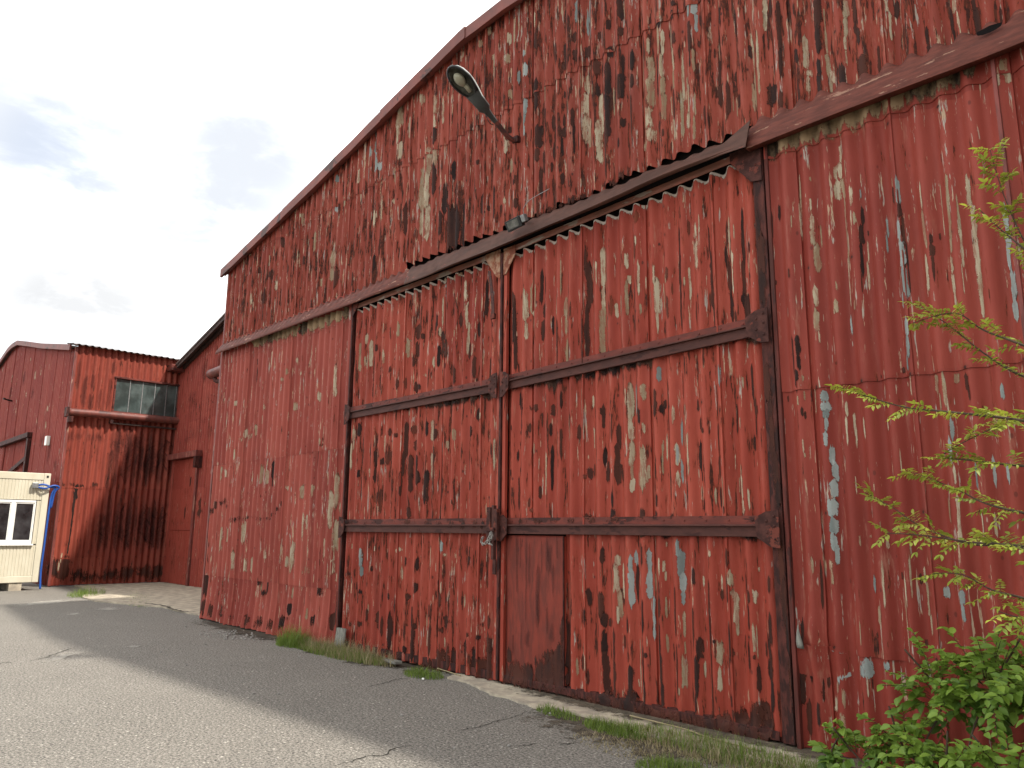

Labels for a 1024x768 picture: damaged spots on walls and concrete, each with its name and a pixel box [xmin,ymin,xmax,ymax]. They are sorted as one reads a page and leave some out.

peeling [582,74,615,164]
peeling [643,15,696,151]
leakage [764,66,976,161]
peeling [516,165,736,258]
peeling [593,236,666,353]
peeling [886,215,912,395]
peeling [940,174,985,317]
peeling [323,428,375,581]
peeling [625,367,690,494]
peeling [797,375,866,585]
corrosion [349,544,775,742]
peeling [613,540,689,695]